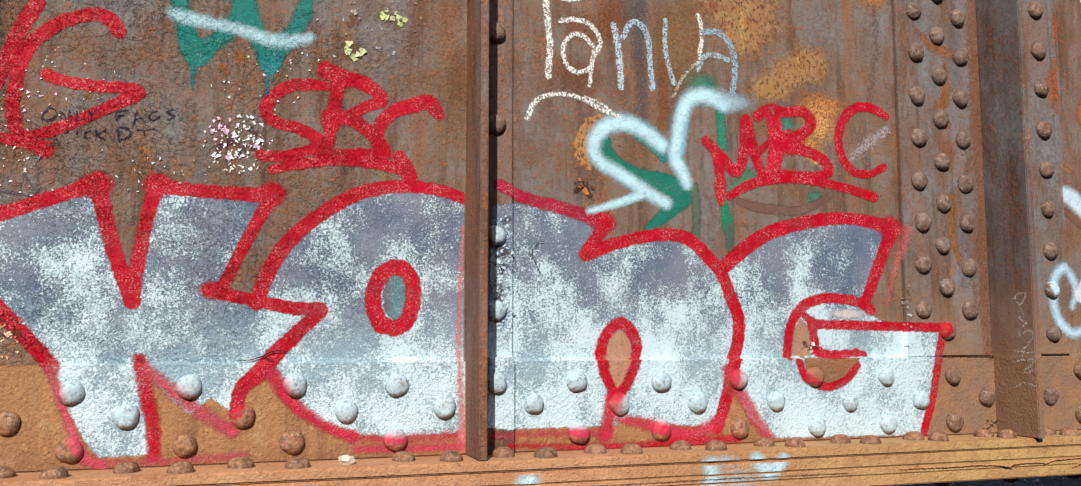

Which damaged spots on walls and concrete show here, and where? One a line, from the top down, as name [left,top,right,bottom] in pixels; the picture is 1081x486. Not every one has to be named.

corrosion [556,59,593,93]
corrosion [573,114,612,170]
corrosion [573,1,628,38]
corrosion [654,0,782,130]
corrosion [752,48,844,167]
corrosion [914,28,953,129]
corrosion [966,0,992,357]
corrosion [1045,60,1059,114]